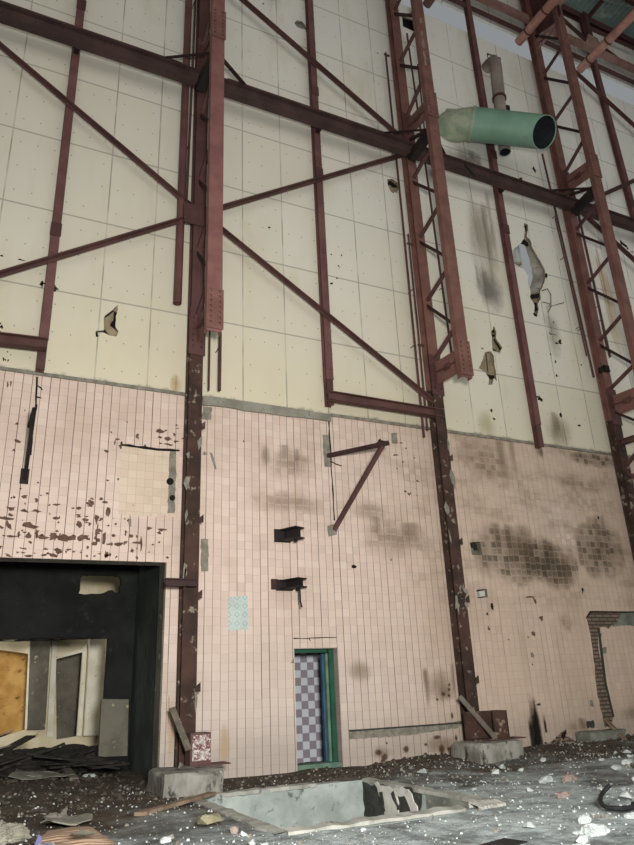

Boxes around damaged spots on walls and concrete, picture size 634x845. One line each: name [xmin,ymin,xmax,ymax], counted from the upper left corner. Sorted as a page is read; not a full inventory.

peeling [156,424,184,513]
spalling [0,488,167,560]
flaking render [586,611,634,729]
water stain [529,703,547,746]